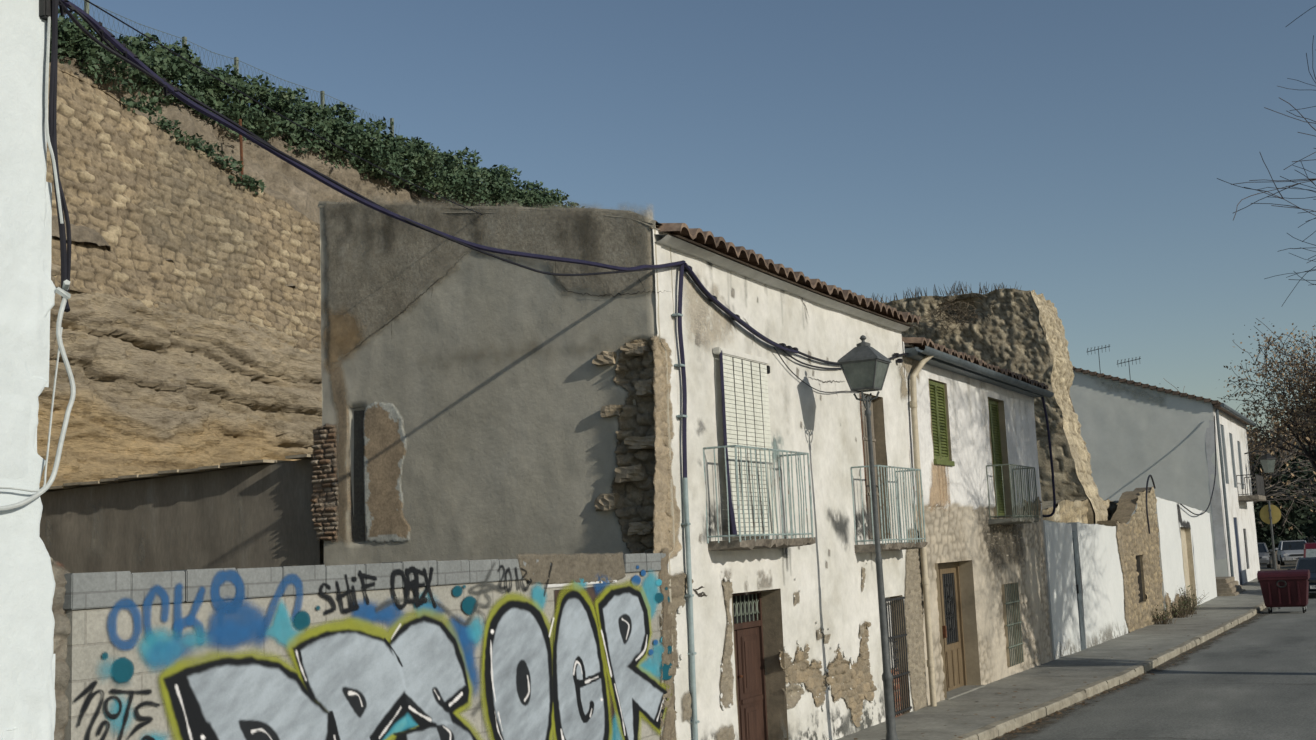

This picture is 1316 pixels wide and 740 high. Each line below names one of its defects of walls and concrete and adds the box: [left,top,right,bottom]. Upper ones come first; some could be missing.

flaking render [310,424,339,542]
peeling [363,402,410,543]
spalling [592,336,694,740]
leakage [829,508,874,542]
peeling [716,571,772,740]
flaking render [779,621,877,727]